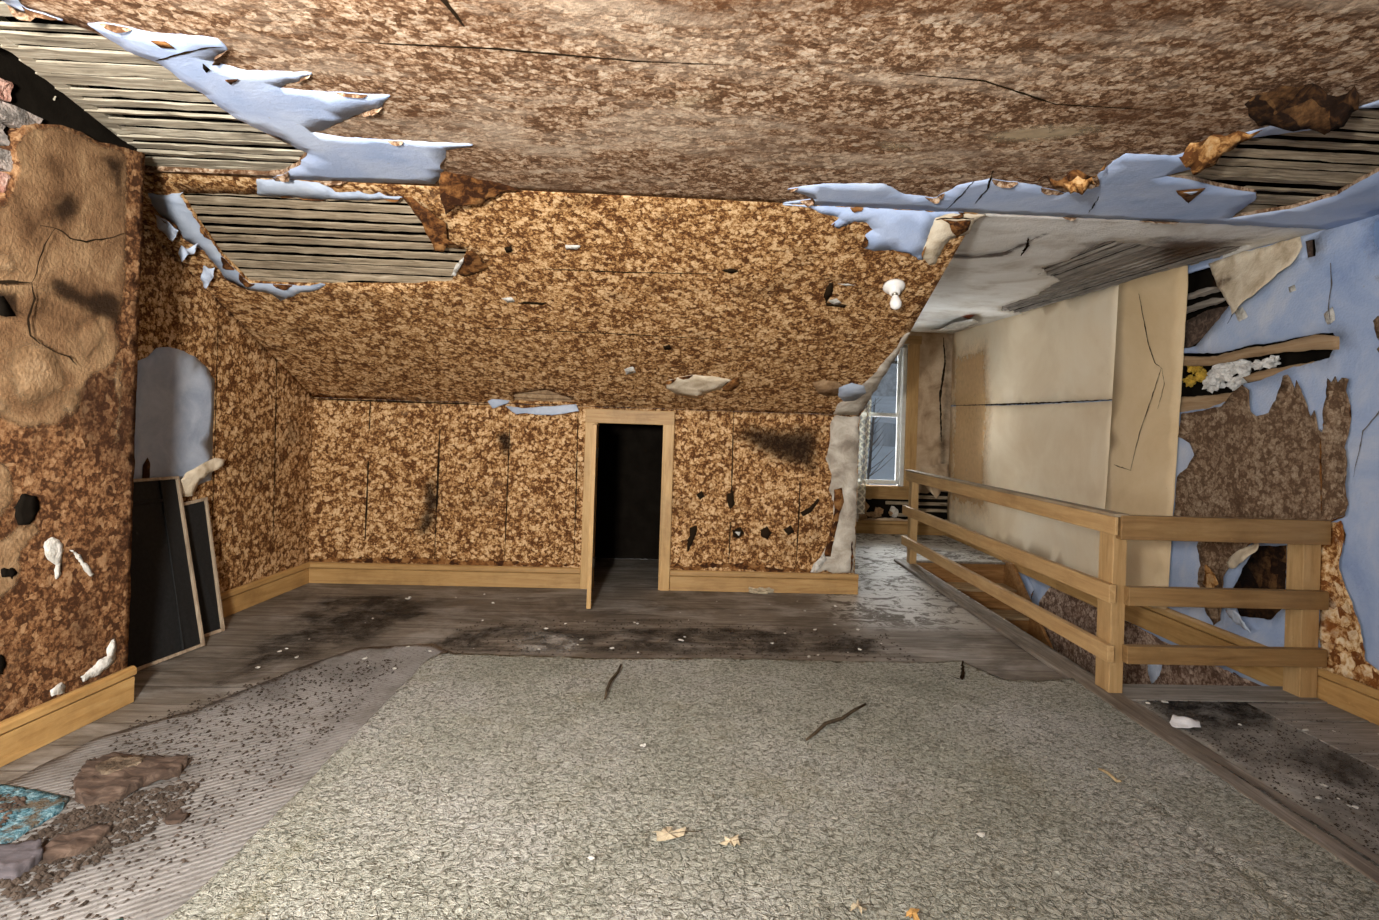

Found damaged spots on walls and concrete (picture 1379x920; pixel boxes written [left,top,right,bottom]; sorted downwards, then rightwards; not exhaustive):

leakage [57,198,76,217]
leakage [53,280,118,323]
leakage [108,159,120,184]
flaking render [0,0,473,497]
peeling [783,100,1379,265]
crack [1116,296,1165,471]
spalling [1013,241,1340,412]
peeling [811,332,948,573]
spalling [0,464,94,596]
spalling [81,639,116,682]
hole [1237,608,1281,620]
hole [1233,545,1287,589]